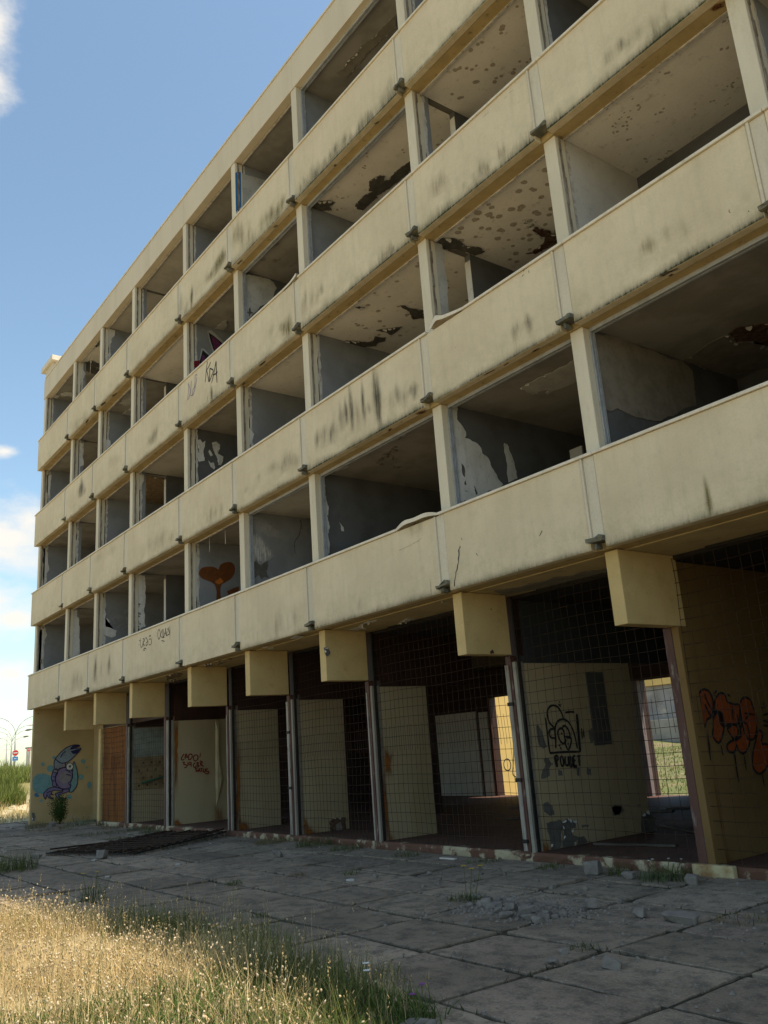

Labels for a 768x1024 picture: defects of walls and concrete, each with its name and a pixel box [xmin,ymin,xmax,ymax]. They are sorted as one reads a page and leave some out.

spalling [355,161,411,211]
spalling [522,219,557,255]
spalling [722,323,768,375]
flaking render [196,439,223,469]
flaking render [452,407,517,502]